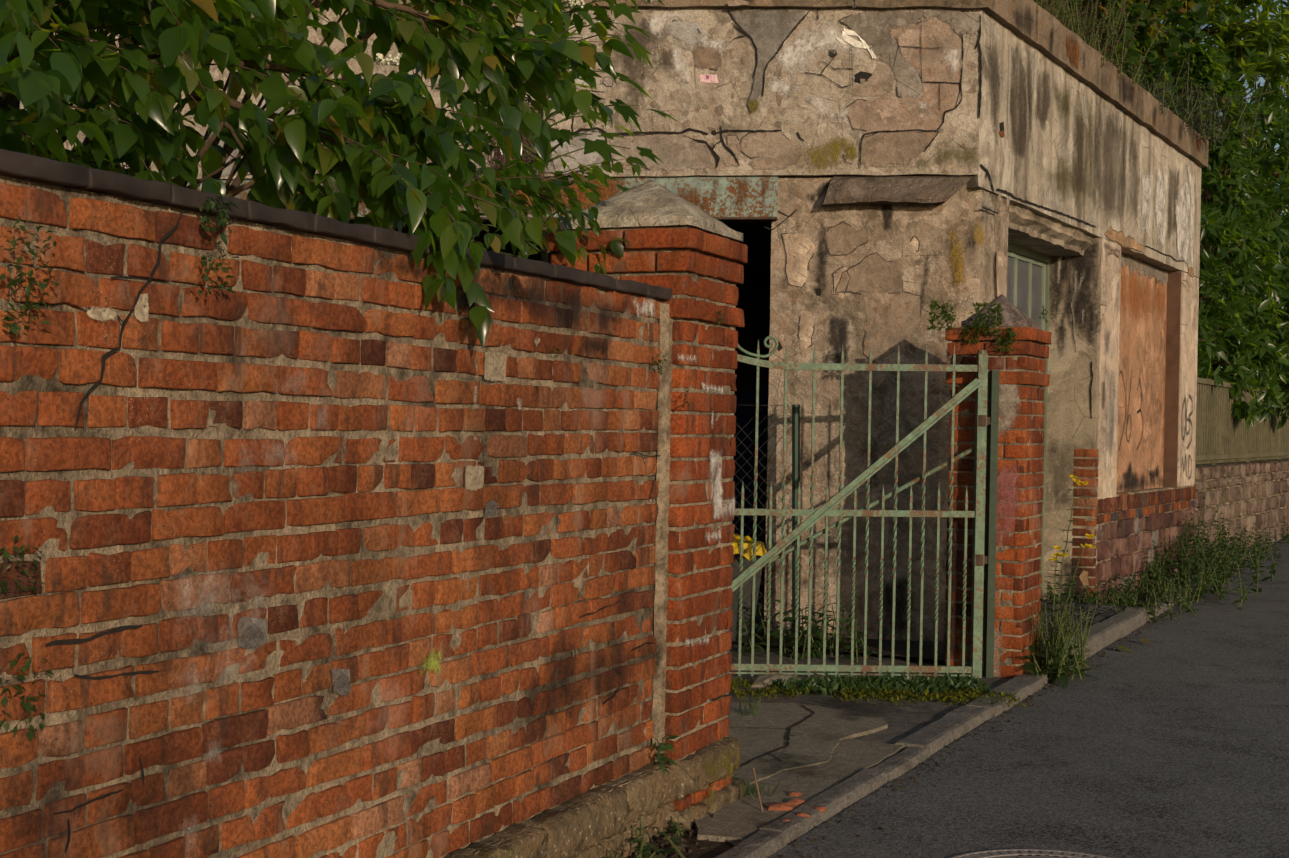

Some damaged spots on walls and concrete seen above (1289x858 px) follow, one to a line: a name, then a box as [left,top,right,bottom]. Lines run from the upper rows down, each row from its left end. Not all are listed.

crack [728,8,819,97]
crack [805,57,852,88]
crack [842,15,982,169]
crack [558,114,805,167]
damp [983,16,1194,264]
corrosion [550,177,623,210]
corrosion [679,181,716,205]
damp [1050,243,1110,349]